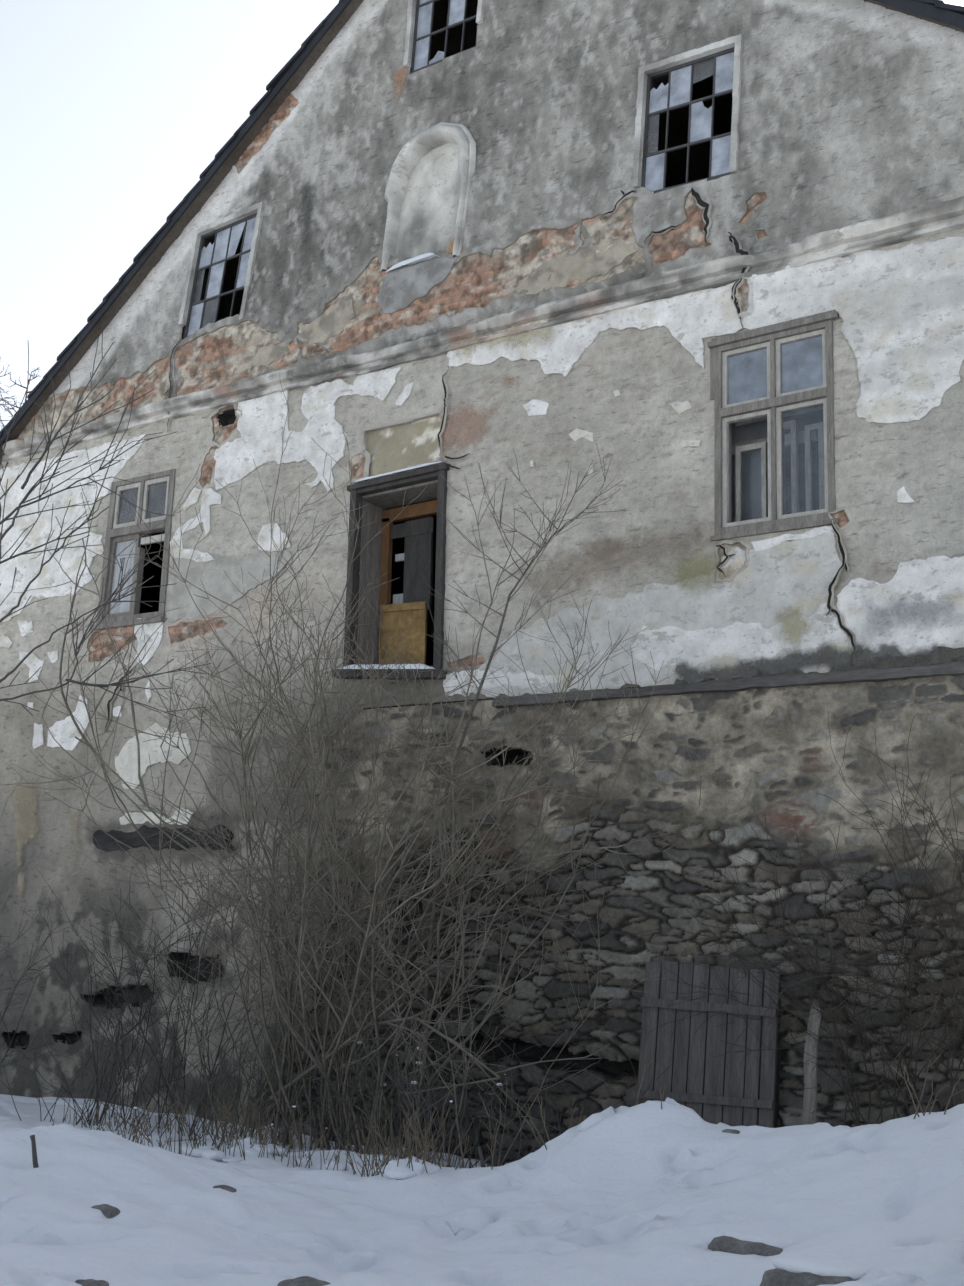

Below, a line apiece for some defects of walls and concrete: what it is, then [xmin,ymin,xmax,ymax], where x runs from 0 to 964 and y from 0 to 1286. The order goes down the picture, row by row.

spalling [232,90,305,181]
crack [644,188,751,327]
spalling [736,189,773,243]
peeling [447,237,964,424]
spalling [0,185,719,683]
peeling [897,486,915,503]
peeling [443,506,964,698]
crack [826,520,857,665]
spalling [85,614,232,703]
peeling [27,695,90,751]
peeling [115,722,192,789]